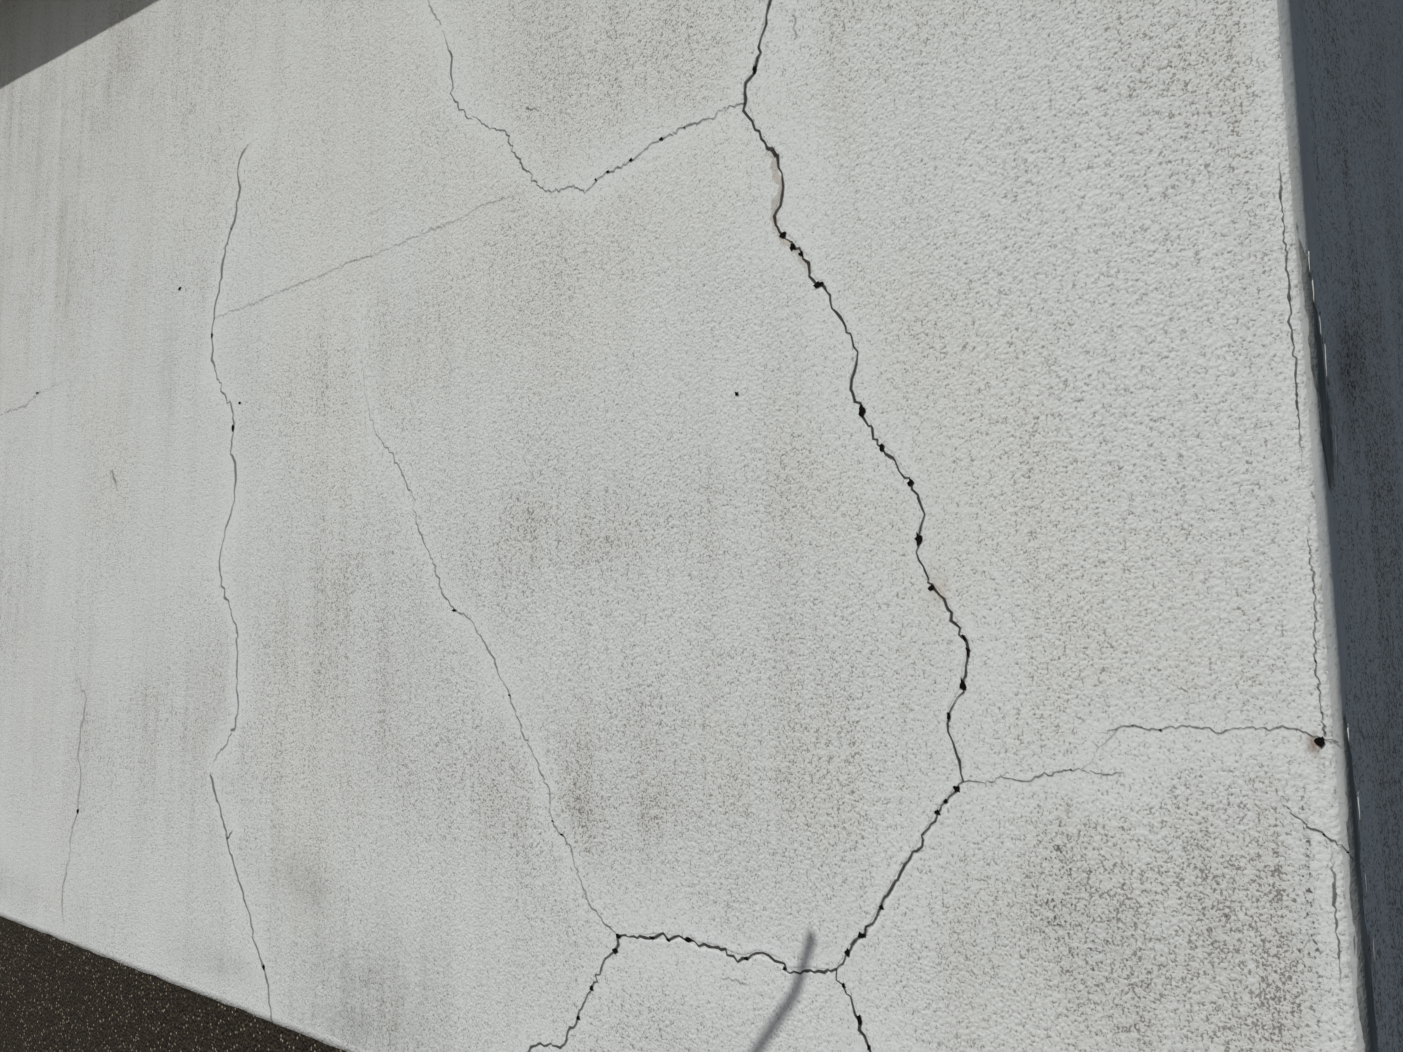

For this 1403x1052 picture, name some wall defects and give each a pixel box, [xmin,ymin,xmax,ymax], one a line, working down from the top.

crack [449,0,1111,1052]
crack [1108,548,1339,743]
crack [1289,811,1349,853]